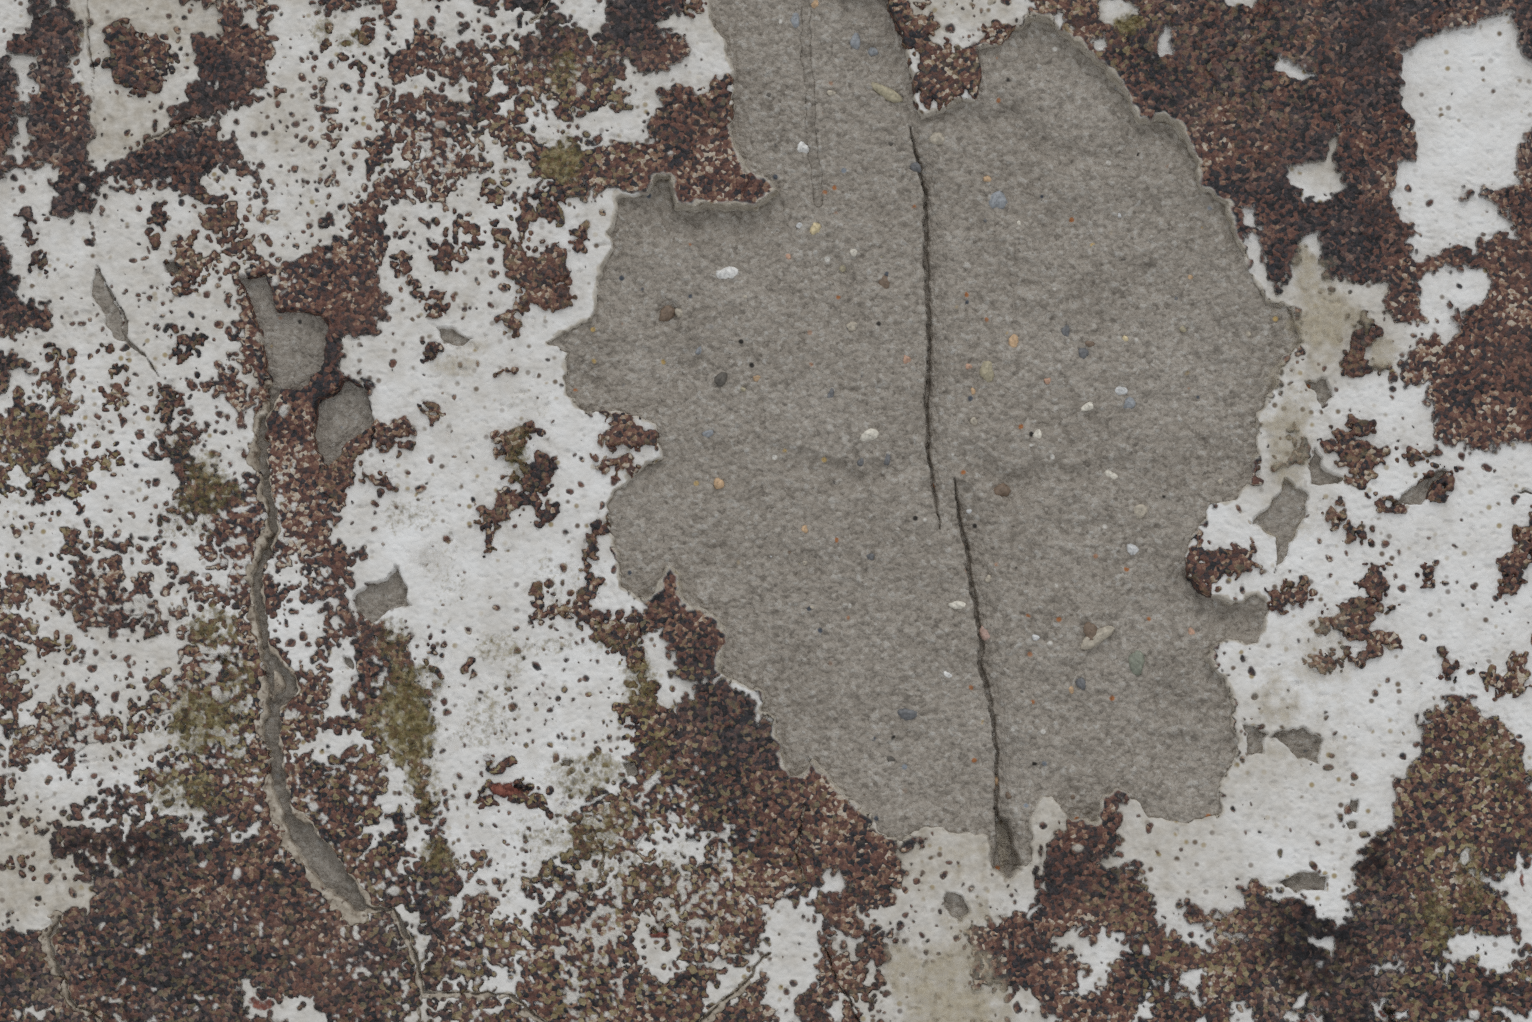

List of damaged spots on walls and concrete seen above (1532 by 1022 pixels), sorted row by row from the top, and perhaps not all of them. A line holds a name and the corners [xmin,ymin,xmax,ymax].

peeling [0,0,549,935]
peeling [284,120,709,935]
crack [910,130,1017,875]
flaking render [509,0,1532,1022]
crack [243,379,547,1022]
crack [589,830,605,899]
crack [38,910,104,1022]
peeling [383,920,407,951]
peeling [395,893,438,983]
peeling [399,954,535,1022]
crack [699,952,772,1022]